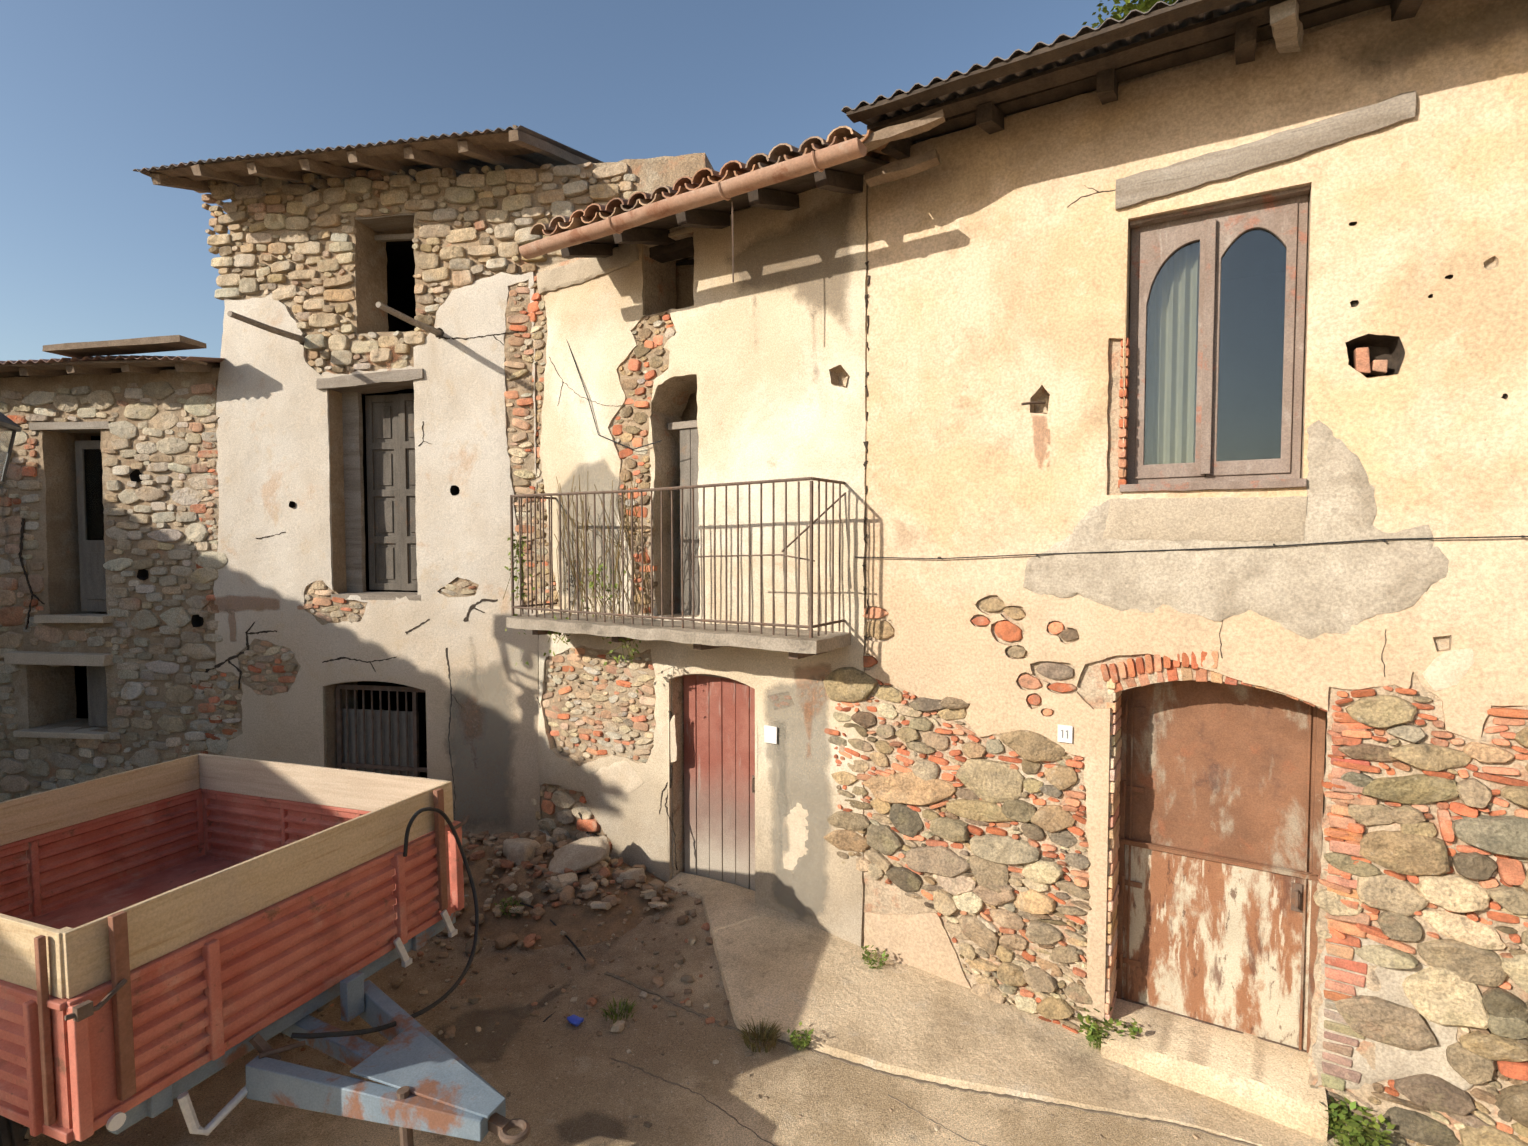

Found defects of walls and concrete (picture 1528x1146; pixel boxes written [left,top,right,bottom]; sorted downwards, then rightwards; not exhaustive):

spalling [195,162,642,608]
spalling [609,310,676,614]
spalling [1345,334,1405,378]
spalling [186,639,301,752]
spalling [531,645,678,857]
damp [767,678,830,917]
spalling [782,598,1093,1034]
spalling [1100,651,1218,683]
spalling [1307,635,1528,1146]